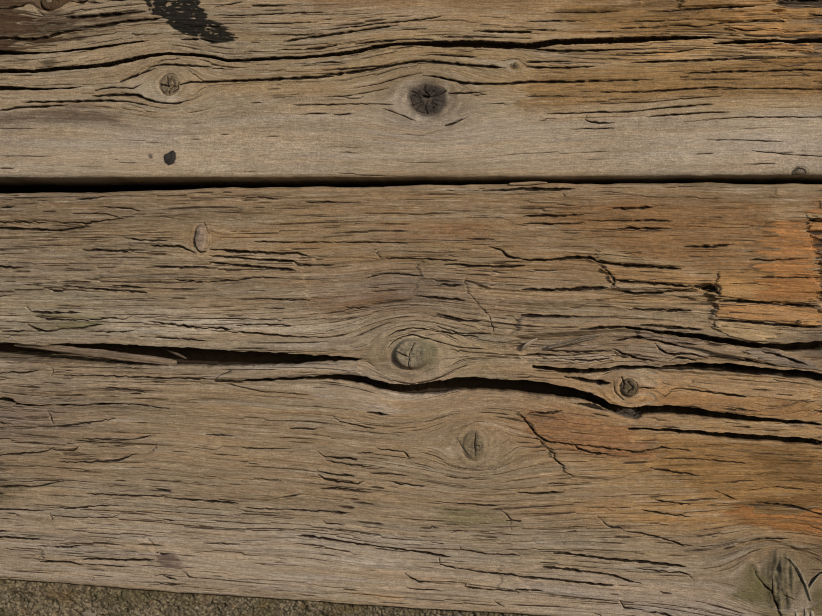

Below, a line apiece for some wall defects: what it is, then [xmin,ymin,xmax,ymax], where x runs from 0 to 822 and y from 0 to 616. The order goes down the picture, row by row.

peeling [677,0,822,53]
peeling [807,221,822,241]
peeling [595,249,822,371]
crack [0,186,822,616]